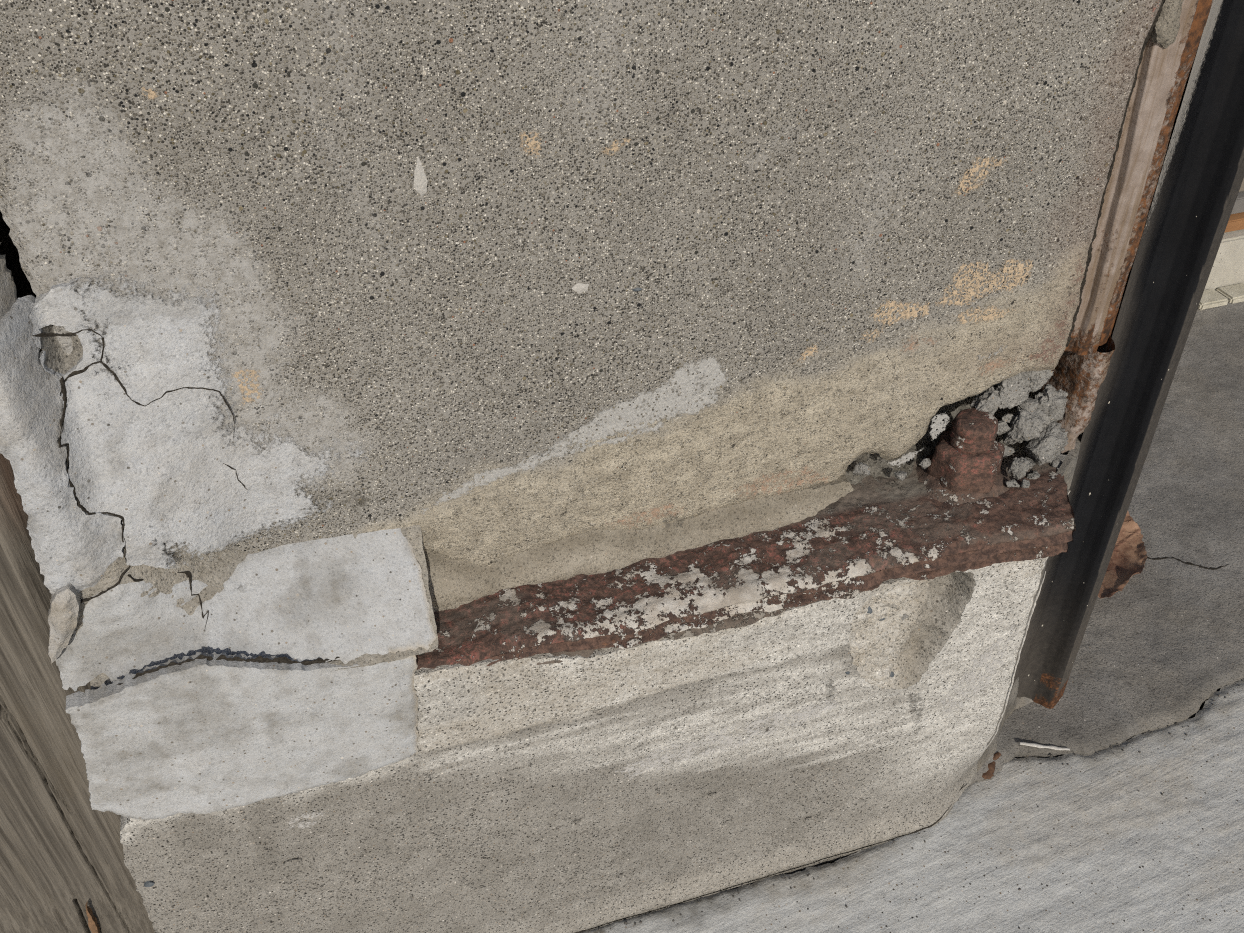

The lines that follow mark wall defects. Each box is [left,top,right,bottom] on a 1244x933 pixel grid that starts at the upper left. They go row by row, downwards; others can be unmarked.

spalling [41,325,83,374]
crack [32,329,235,603]
spalling [844,396,975,485]
spalling [994,390,1040,456]
peeling [48,583,81,663]
crack [117,571,340,685]